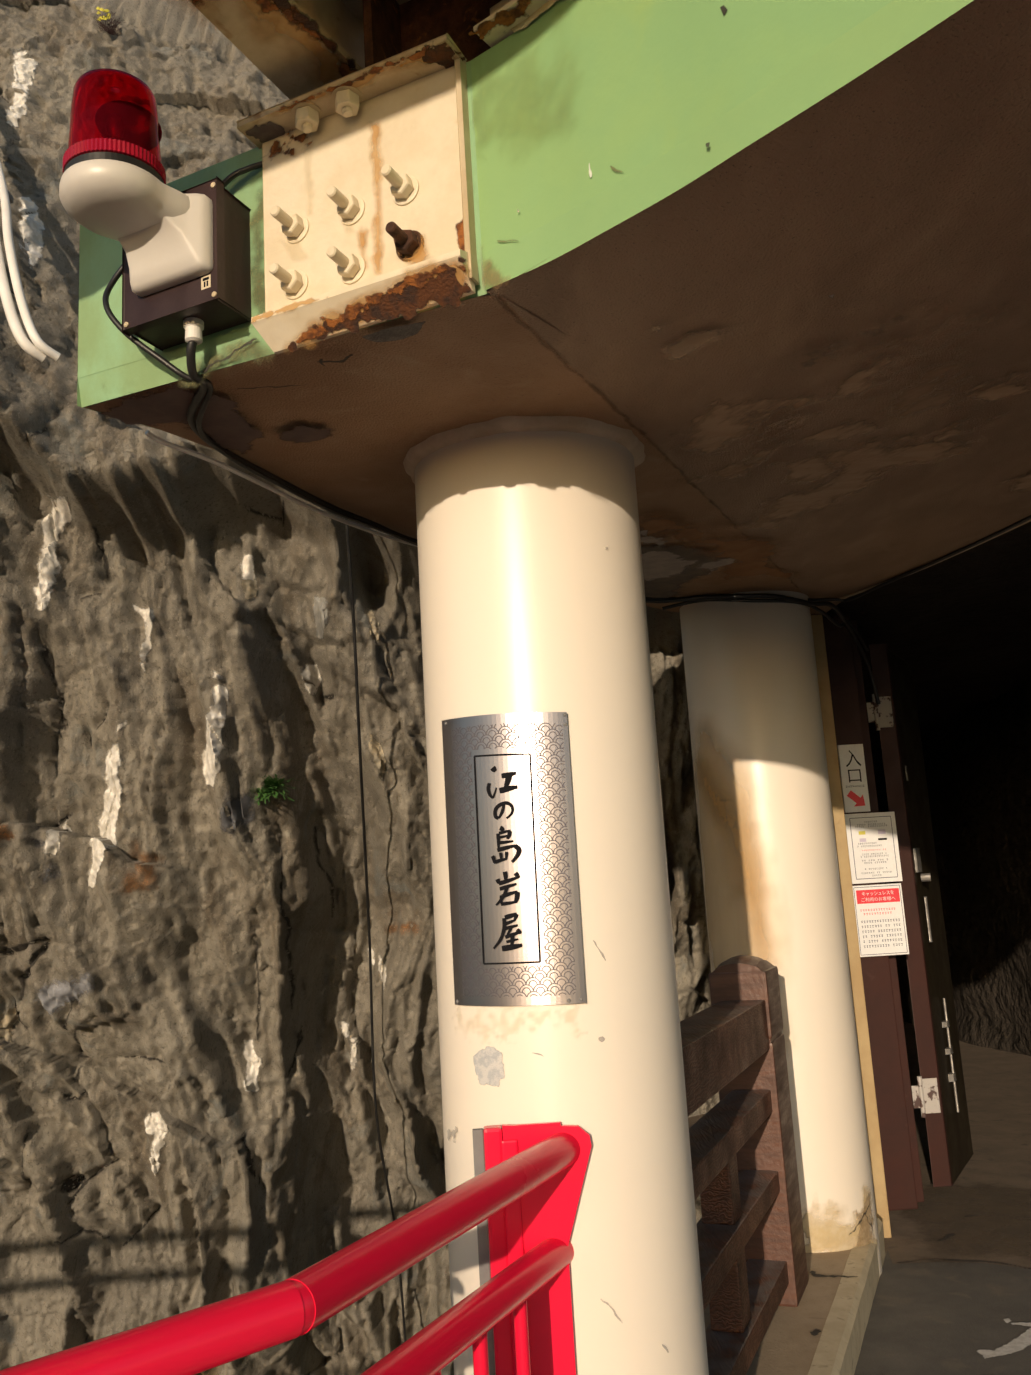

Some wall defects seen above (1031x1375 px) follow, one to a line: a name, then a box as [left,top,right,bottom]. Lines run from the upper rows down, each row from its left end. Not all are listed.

rust [468,0,531,40]
rust [243,0,465,112]
rust [269,129,312,157]
rust [372,125,380,182]
rust [252,213,502,352]
peeling [100,384,332,454]
spalling [641,545,726,598]
peeling [473,1046,505,1086]
leakage [802,1190,877,1253]